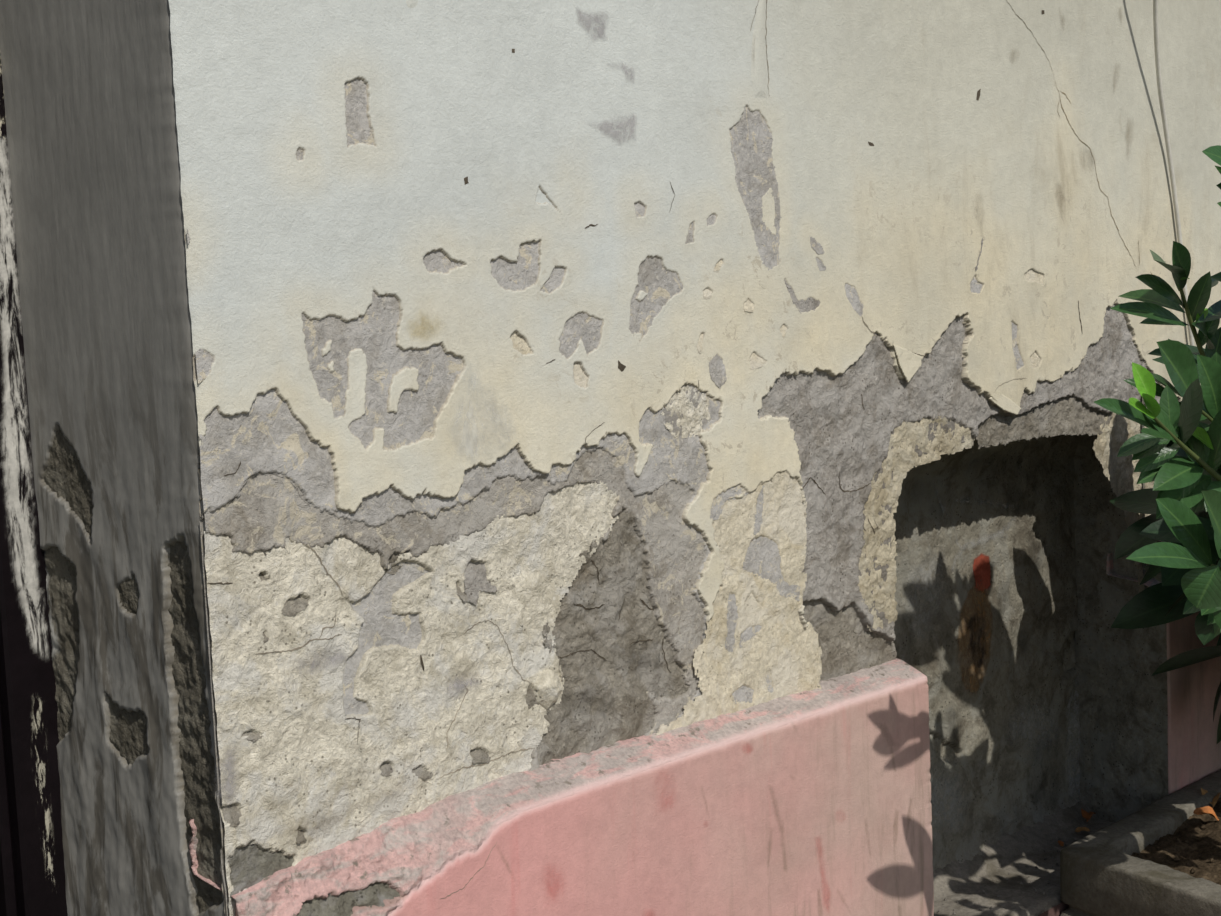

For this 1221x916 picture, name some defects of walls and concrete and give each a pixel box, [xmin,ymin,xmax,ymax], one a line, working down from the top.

peeling [345,79,375,146]
crack [1006,0,1152,274]
spalling [729,106,782,270]
spalling [490,241,565,293]
spalling [629,257,683,336]
spalling [784,279,820,314]
spalling [168,291,1160,916]